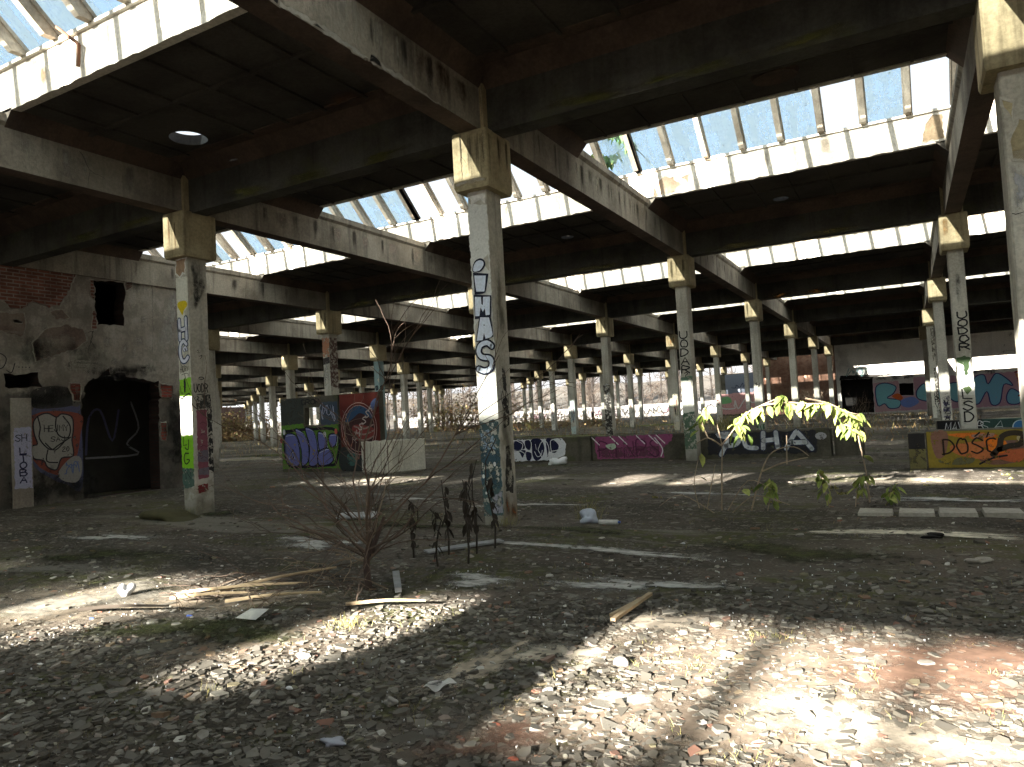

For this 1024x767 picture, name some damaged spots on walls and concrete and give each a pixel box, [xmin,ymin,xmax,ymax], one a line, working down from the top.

flaking render [0,265,76,310]
leakage [191,266,204,306]